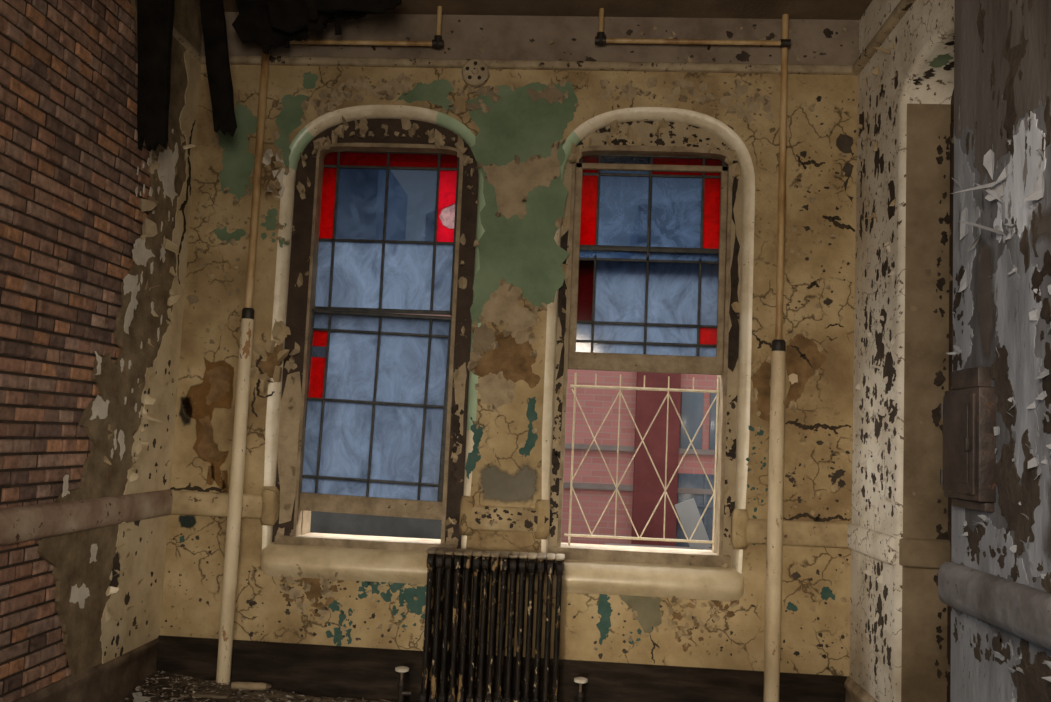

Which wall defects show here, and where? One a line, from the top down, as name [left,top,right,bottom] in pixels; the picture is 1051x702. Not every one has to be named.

crack [796,154,826,169]
peeling [123,129,196,349]
crack [822,215,855,232]
peeling [214,71,740,549]
crack [753,334,813,368]
peeling [913,0,1051,582]
peeling [90,358,174,485]
crack [785,419,852,434]
peeling [275,564,427,646]
spalling [591,594,755,659]
spalling [860,558,891,676]
spalling [934,608,1051,702]